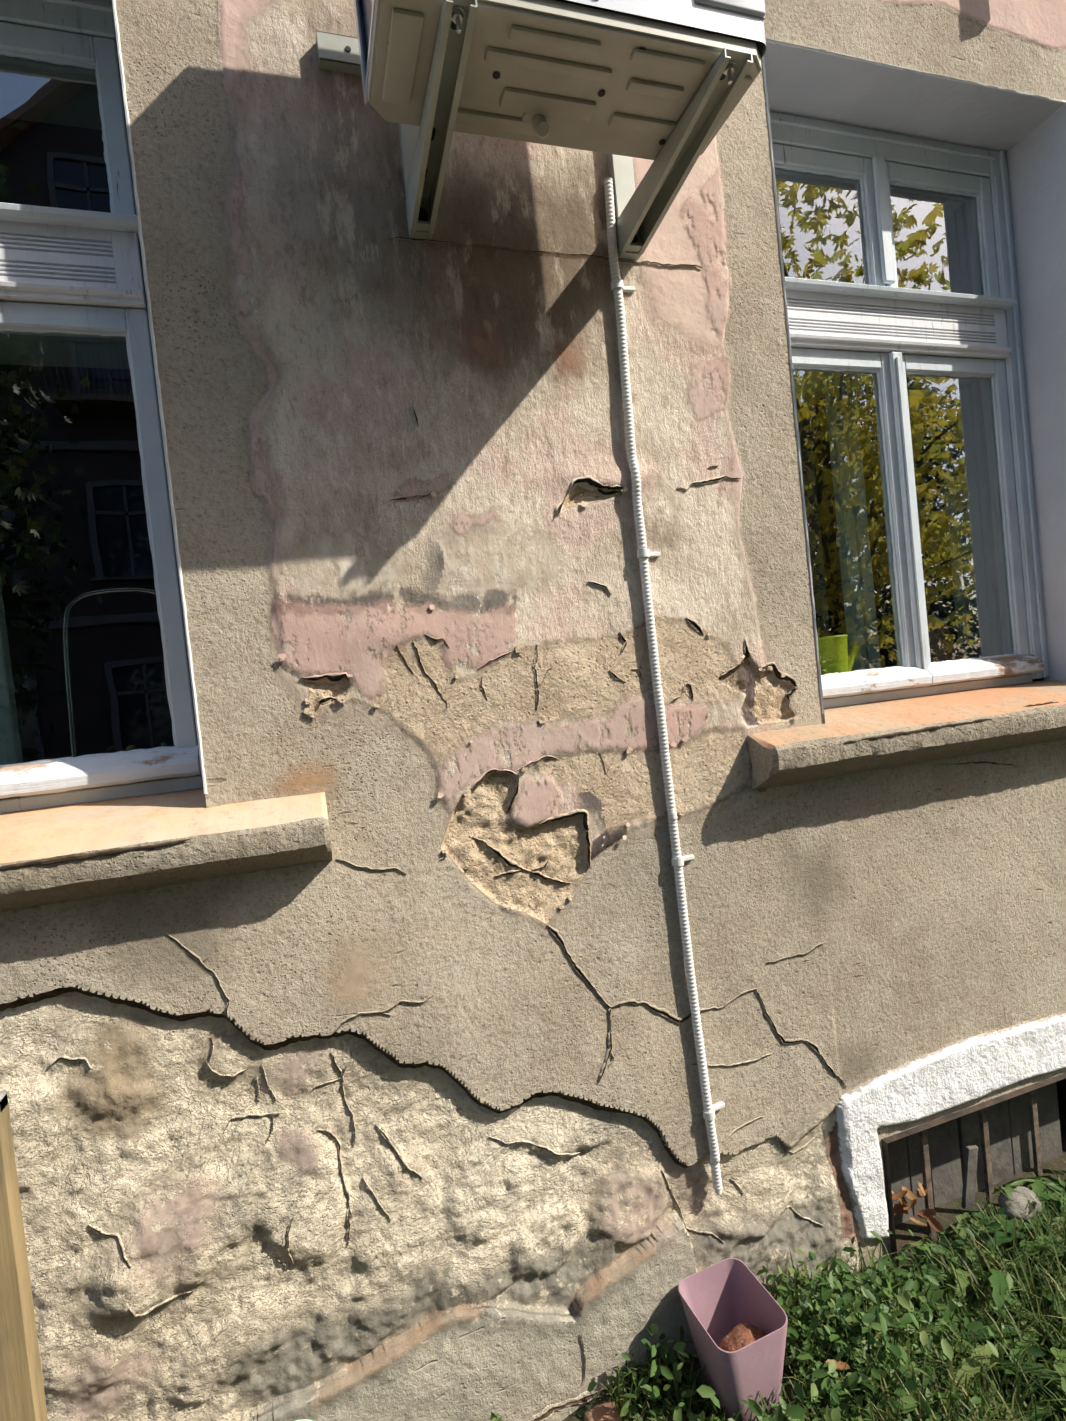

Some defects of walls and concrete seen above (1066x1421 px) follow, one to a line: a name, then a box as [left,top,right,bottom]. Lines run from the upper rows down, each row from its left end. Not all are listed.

peeling [229,0,798,929]
crack [553,475,623,520]
crack [0,925,846,1244]